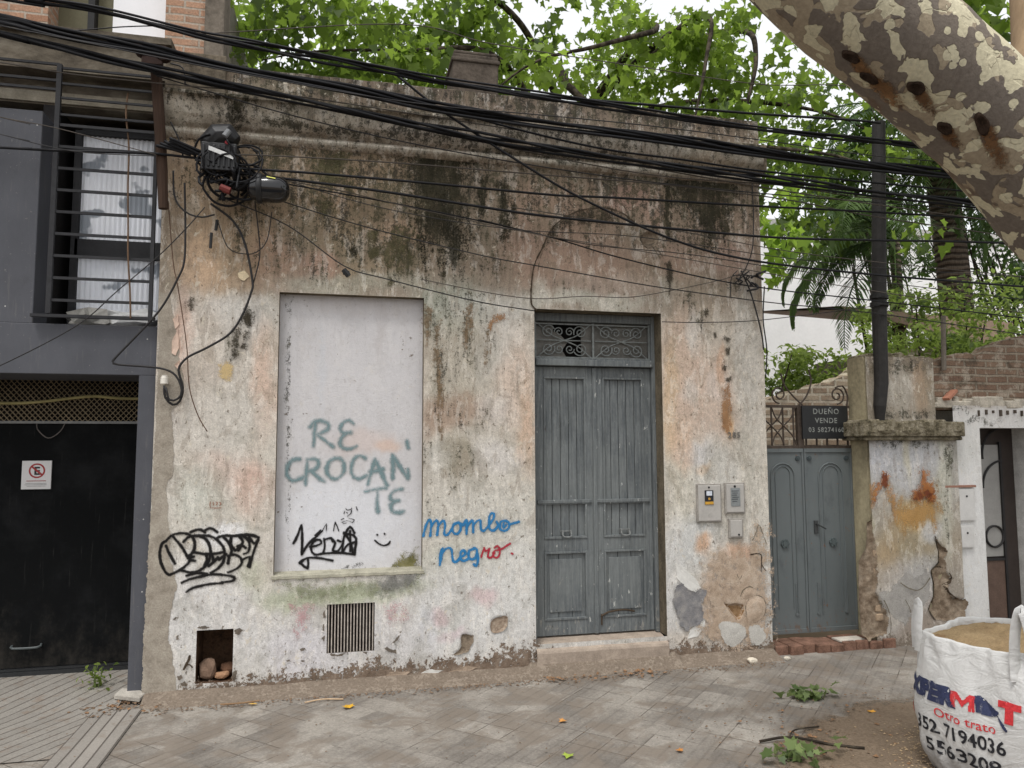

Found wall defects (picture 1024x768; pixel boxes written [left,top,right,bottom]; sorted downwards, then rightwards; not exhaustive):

mould [309,151,365,231]
damp [349,157,516,286]
damp [663,179,749,260]
damp [665,261,674,295]
rust [721,348,732,434]
peeling [141,292,554,694]
rust [869,466,943,532]
peeling [668,515,779,655]
flaking render [858,519,889,641]
flaking render [929,536,969,622]